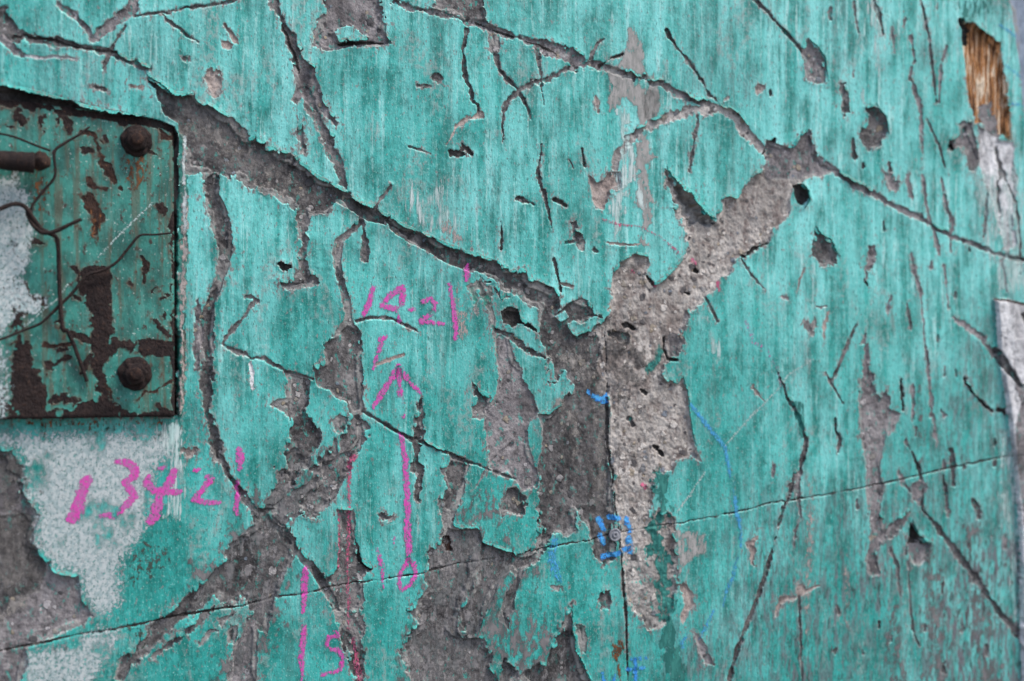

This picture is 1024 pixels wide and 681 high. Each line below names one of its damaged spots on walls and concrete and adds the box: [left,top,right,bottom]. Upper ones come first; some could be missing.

rust [0,99,174,247]
rust [0,202,182,441]
crack [269,0,351,196]
spalling [0,23,832,681]
crack [0,171,1023,681]
crack [536,144,552,228]
crack [390,0,776,172]
peeling [811,226,841,267]
peeling [851,103,890,169]
peeling [855,333,932,646]
crack [813,2,1024,292]